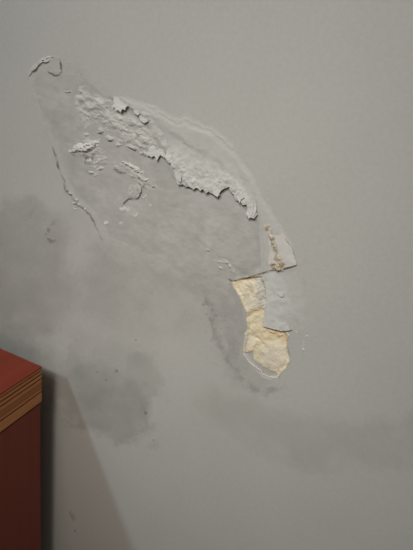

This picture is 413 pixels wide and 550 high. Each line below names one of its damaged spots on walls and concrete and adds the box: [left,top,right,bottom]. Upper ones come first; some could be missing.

damp [0,216,72,364]
peeling [27,56,314,380]
damp [58,347,151,443]